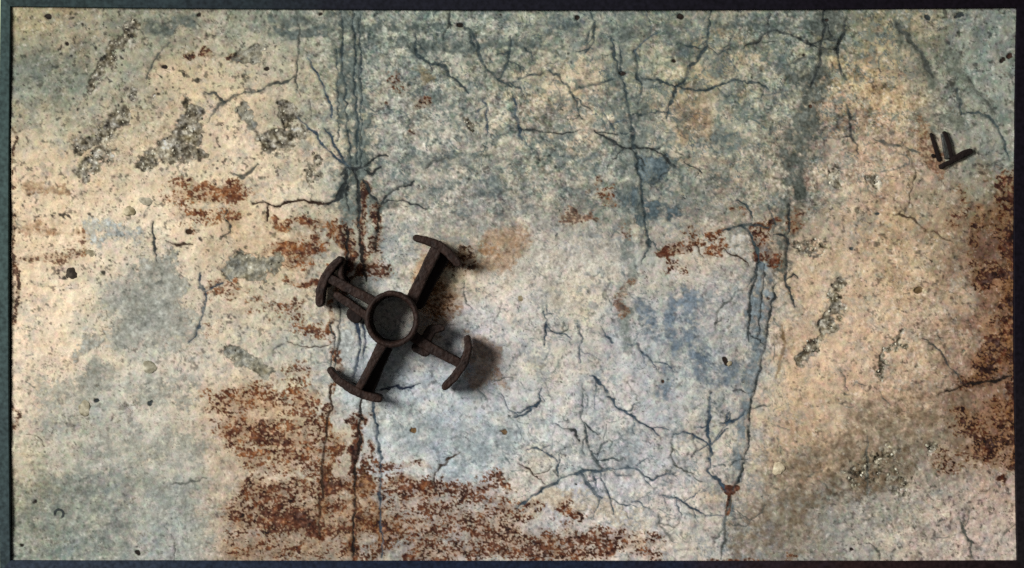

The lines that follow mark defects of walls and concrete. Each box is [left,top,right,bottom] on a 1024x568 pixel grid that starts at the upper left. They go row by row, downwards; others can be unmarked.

spalling [87,18,141,95]
spalling [71,86,163,184]
spalling [135,94,209,172]
spalling [234,100,306,154]
crack [413,10,847,261]
crack [895,22,1009,157]
corrosion [160,177,252,232]
crack [204,10,442,558]
corrosion [200,180,666,561]
crack [498,200,798,558]
corrosion [654,225,728,274]
corrosion [932,170,1015,485]